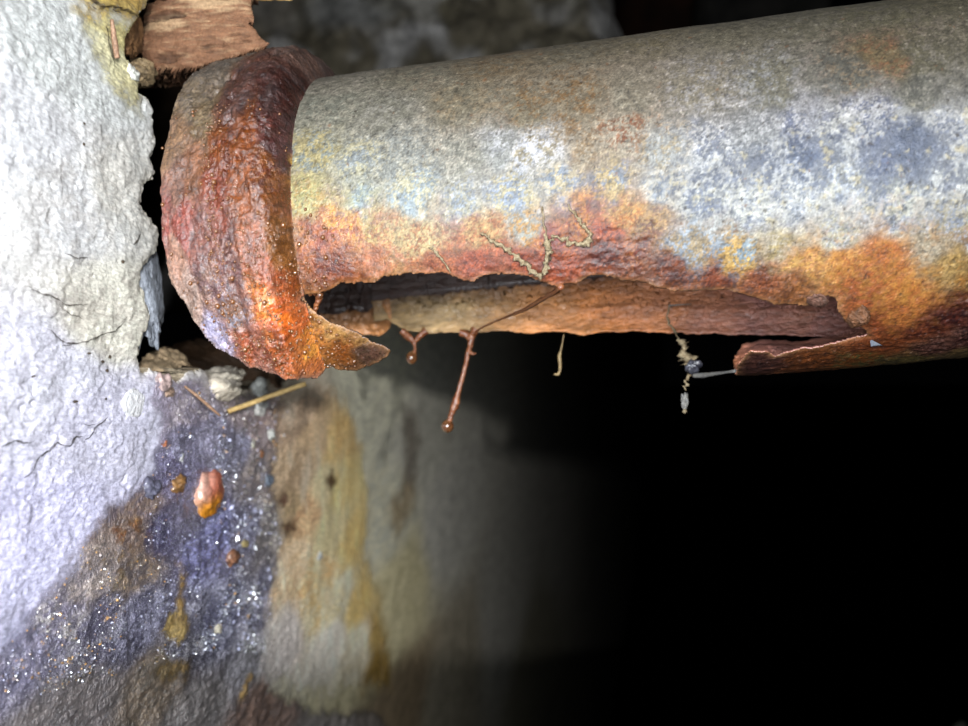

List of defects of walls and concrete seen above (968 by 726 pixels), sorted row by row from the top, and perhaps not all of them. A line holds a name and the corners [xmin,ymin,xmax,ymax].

crack [87,0,139,64]
damp [81,0,148,105]
corrosion [308,291,326,312]
corrosion [399,327,429,364]
damp [0,380,389,726]